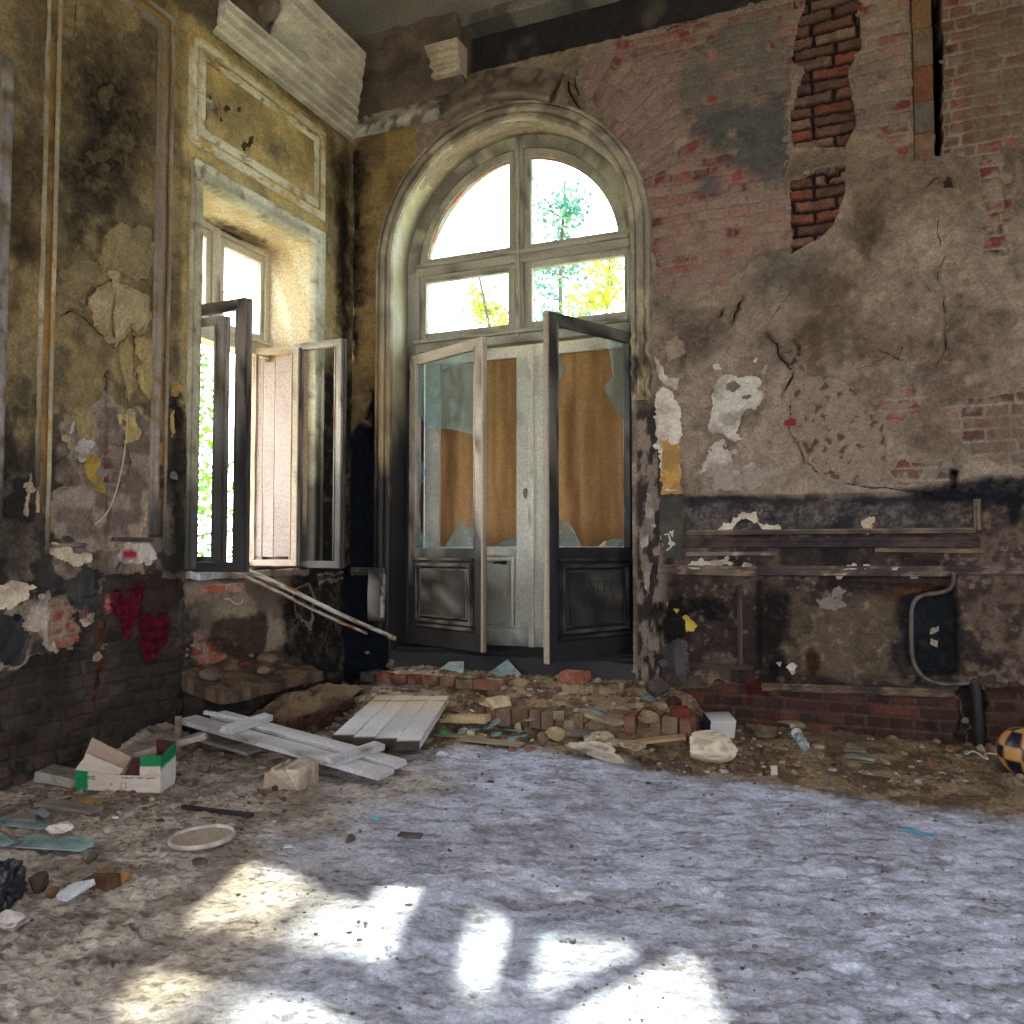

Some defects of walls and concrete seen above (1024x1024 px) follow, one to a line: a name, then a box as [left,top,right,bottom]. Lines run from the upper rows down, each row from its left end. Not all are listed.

water stain [11,148,34,249]
water stain [61,55,146,203]
flaking render [0,221,236,791]
water stain [333,157,358,343]
water stain [367,390,375,454]
peeling [640,357,752,598]
peeling [699,358,774,491]
spalling [578,0,914,299]
crack [767,284,800,441]
spalling [780,367,960,487]
crack [843,483,942,500]
crack [924,215,947,364]